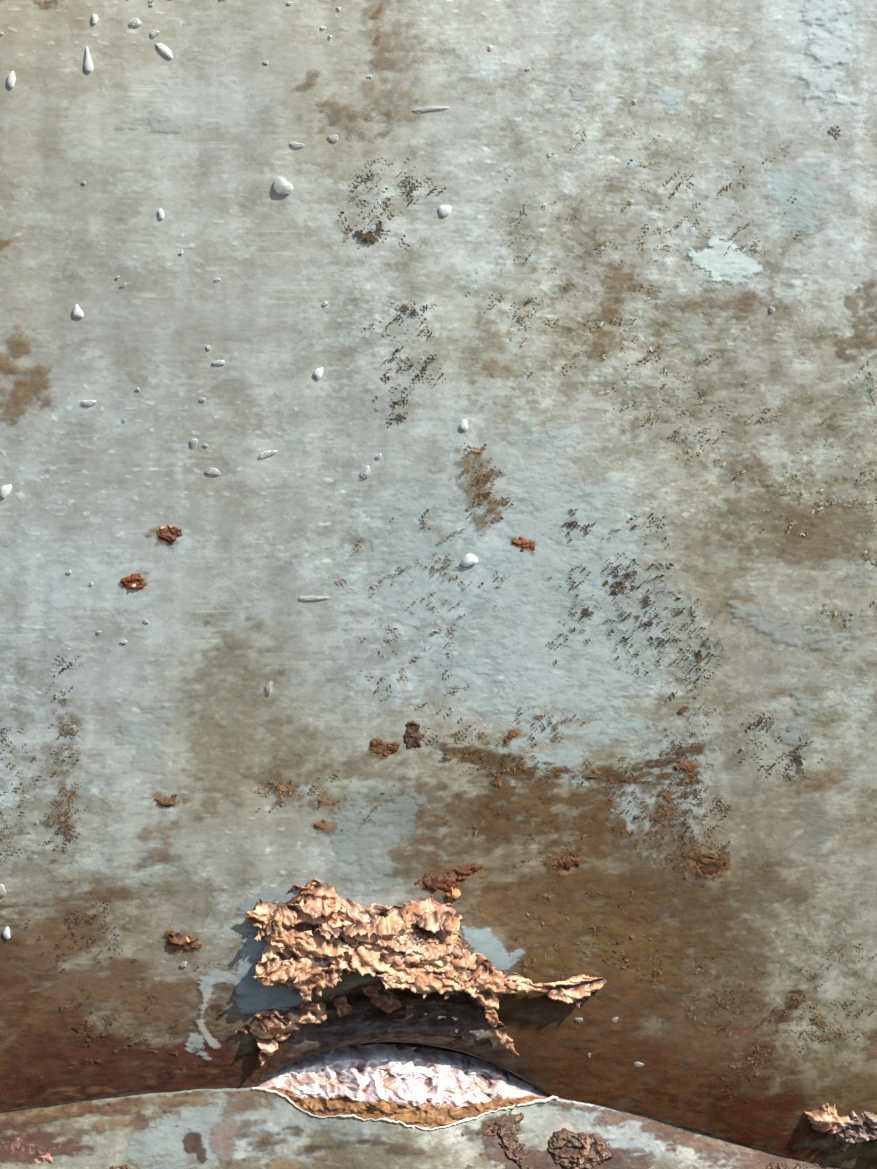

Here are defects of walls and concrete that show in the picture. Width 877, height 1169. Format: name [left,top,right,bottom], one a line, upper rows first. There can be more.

rust [0,325,52,422]
rust [0,442,877,1169]
peeling [238,883,308,914]
peeling [460,923,525,971]
peeling [186,933,305,1060]